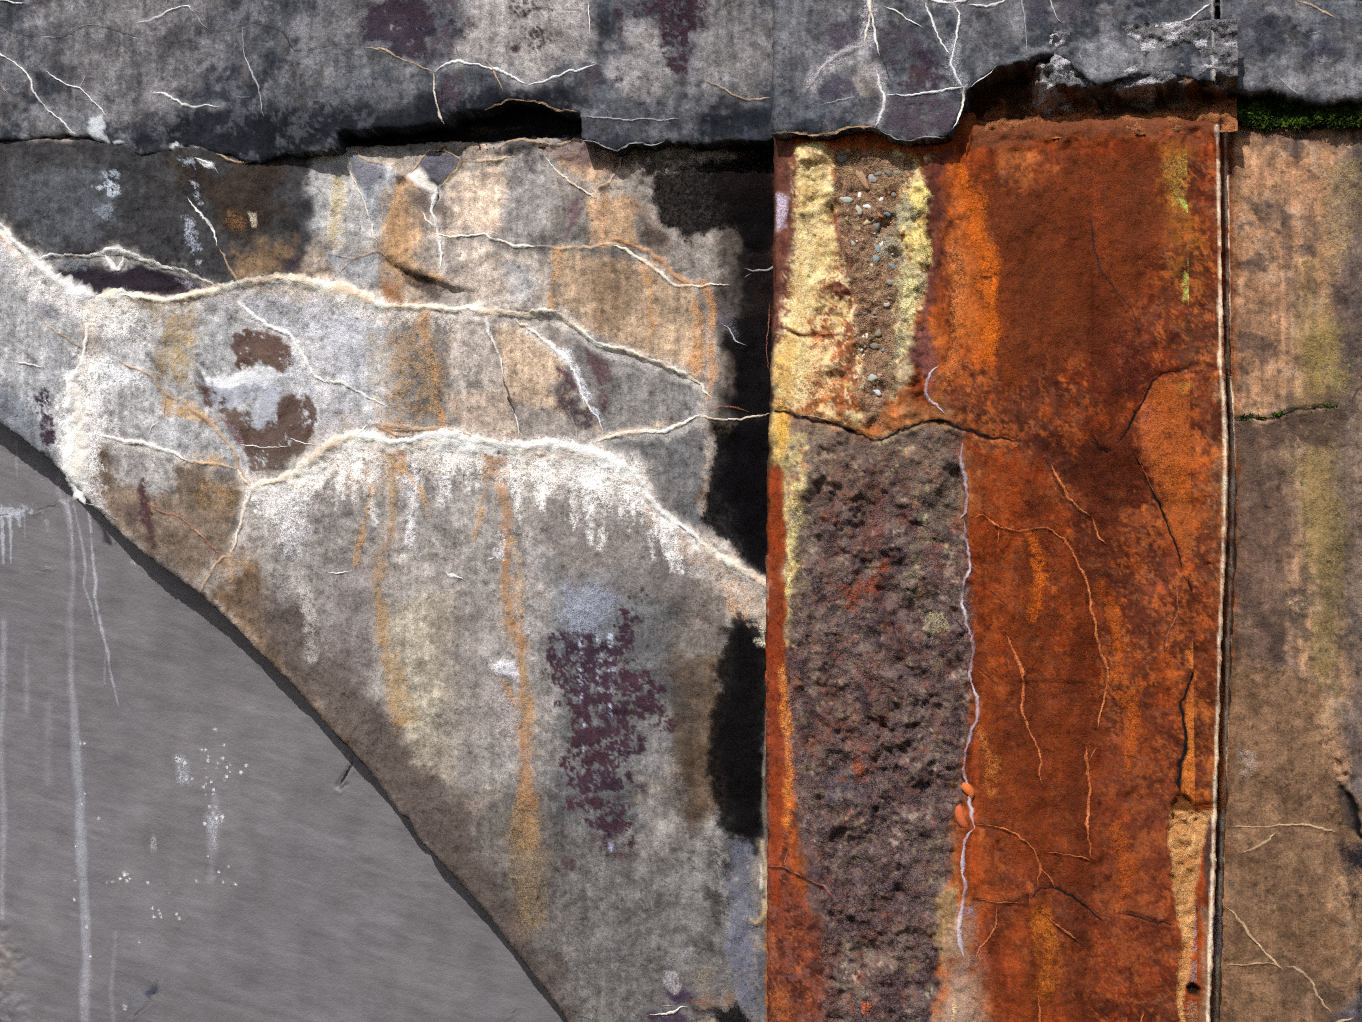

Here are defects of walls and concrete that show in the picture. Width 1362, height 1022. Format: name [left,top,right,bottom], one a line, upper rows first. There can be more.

crack [0,0,773,287]
crack [776,0,1056,140]
damp [903,183,930,323]
corrosion [1142,376,1192,554]
damp [0,143,839,1022]
crack [0,151,1171,959]
corrosion [769,468,793,903]
corrosion [969,452,1140,890]
crack [1176,672,1194,790]
corrosion [1181,644,1195,805]
corrosion [1217,683,1226,809]
crack [1217,780,1362,852]